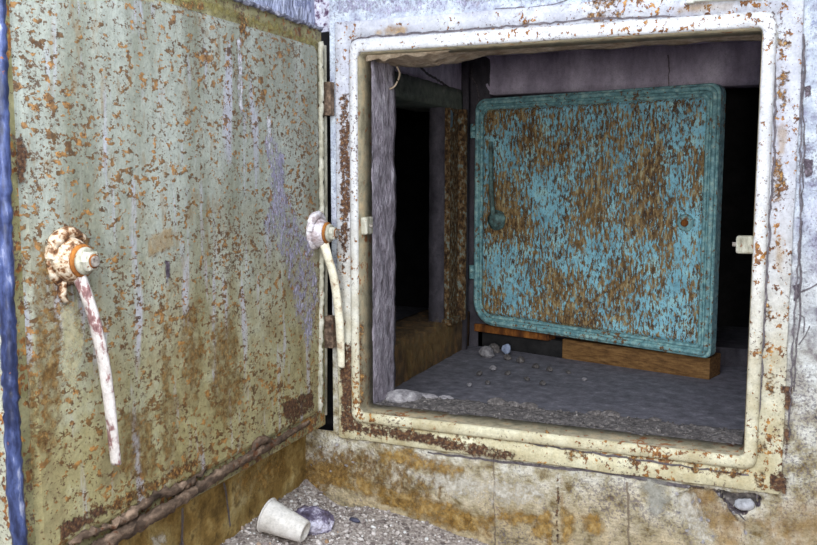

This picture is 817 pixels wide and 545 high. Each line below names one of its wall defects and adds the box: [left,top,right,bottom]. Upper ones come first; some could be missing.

corrosion [587,0,624,22]
corrosion [776,33,792,108]
corrosion [338,93,350,275]
corrosion [772,156,787,211]
crack [788,34,817,437]
corrosion [474,323,563,358]
corrosion [281,391,314,424]
corrosion [338,322,515,460]
corrosion [763,373,795,410]
corrosion [56,457,198,540]
leakage [305,443,603,545]
corrosion [709,467,788,494]